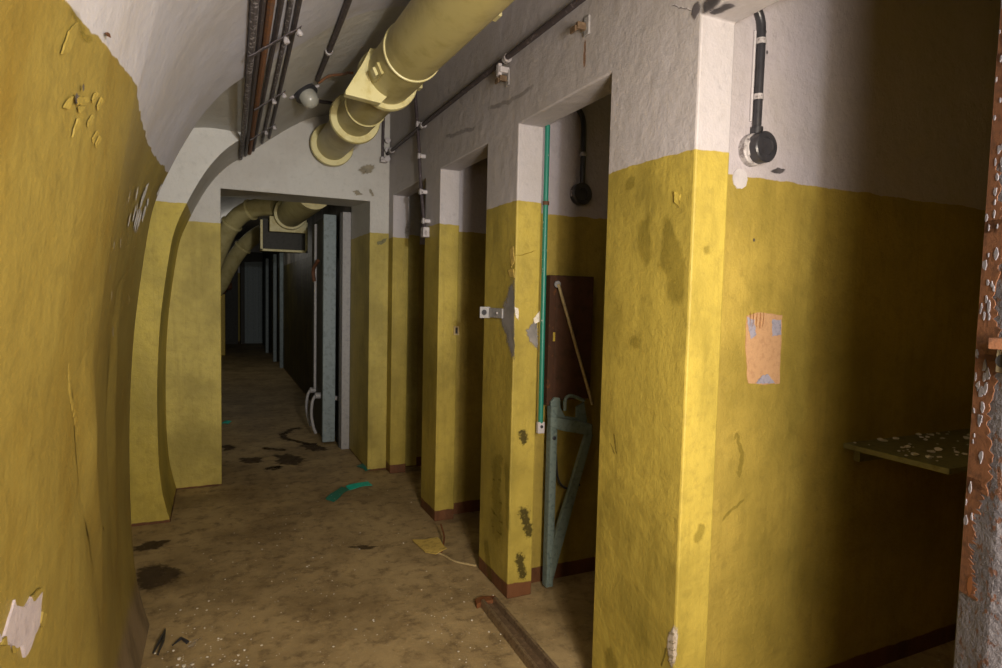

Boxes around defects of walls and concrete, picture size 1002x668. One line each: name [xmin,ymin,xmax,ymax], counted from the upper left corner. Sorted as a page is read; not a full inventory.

peeling [63,84,104,147]
corrosion [959,0,1002,601]
peeling [0,588,47,658]